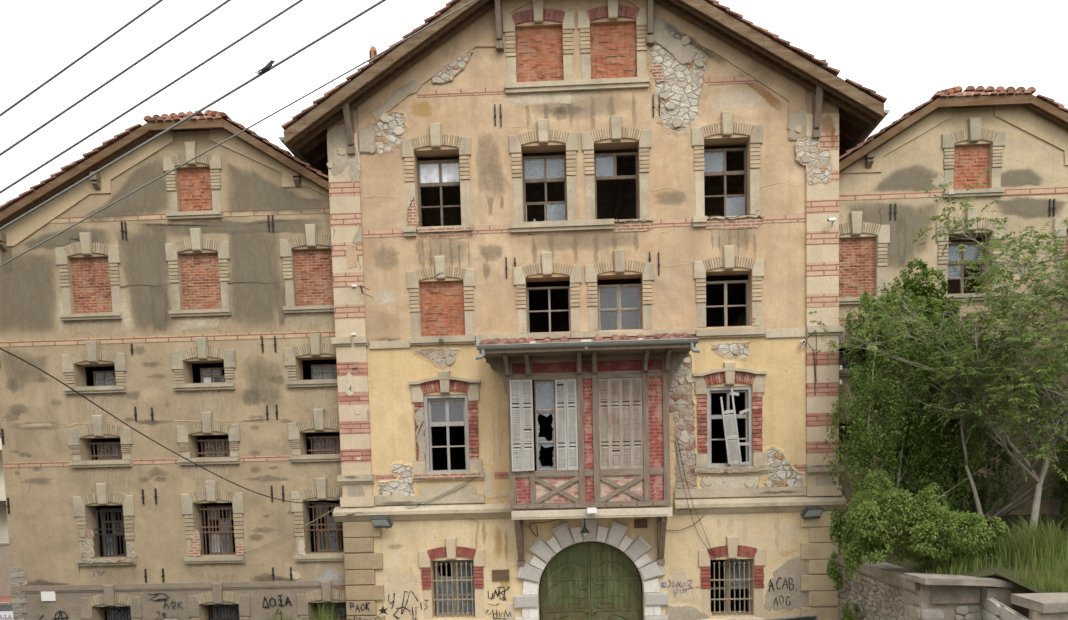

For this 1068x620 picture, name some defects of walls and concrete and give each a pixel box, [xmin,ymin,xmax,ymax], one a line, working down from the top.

flaking render [646,16,713,138]
flaking render [327,110,411,183]
flaking render [788,108,833,185]
water stain [0,164,333,339]
flaking render [412,345,462,370]
flaking render [710,340,754,362]
water stain [81,396,116,419]
water stain [298,387,332,412]
flaking render [669,351,834,495]
water stain [191,464,227,490]
flaking render [348,460,509,505]